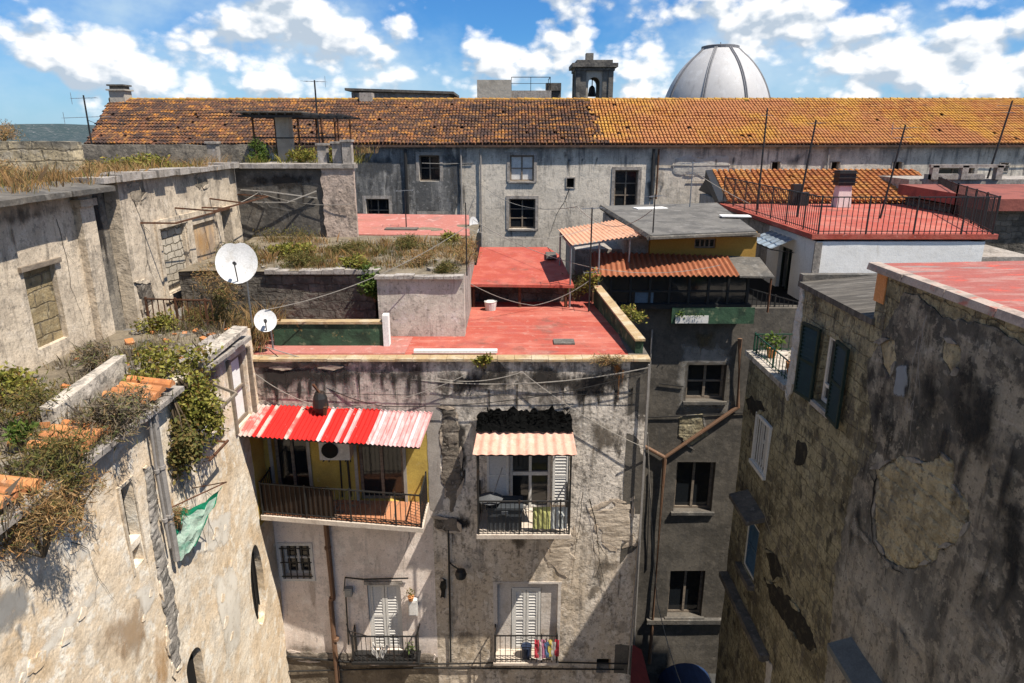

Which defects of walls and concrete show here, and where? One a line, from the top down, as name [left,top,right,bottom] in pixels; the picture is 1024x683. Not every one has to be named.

damp [263,367,422,402]
spalling [431,405,464,534]
damp [453,368,633,414]
spalling [745,395,765,417]
spalling [794,440,808,466]
spalling [870,452,971,568]
damp [952,364,994,503]
spalling [762,548,817,654]